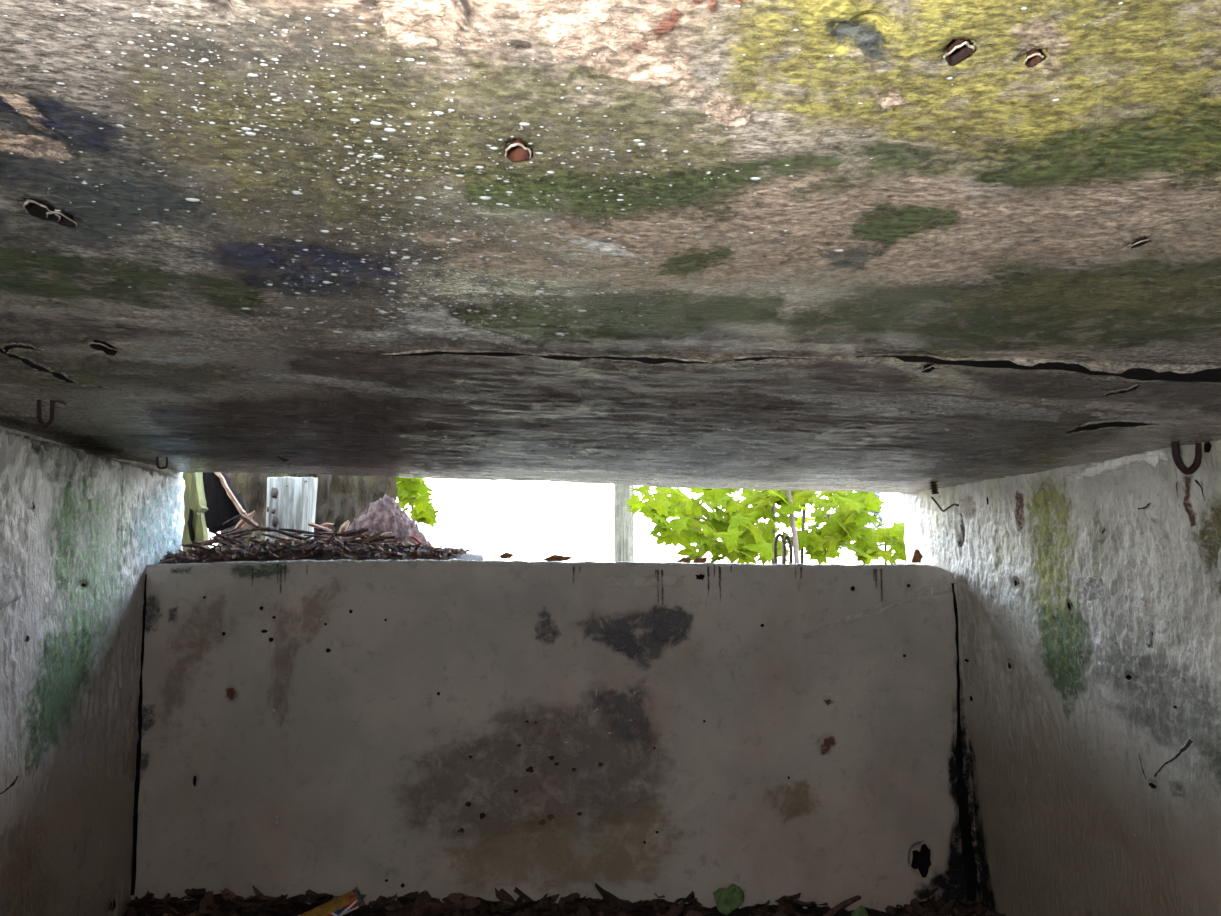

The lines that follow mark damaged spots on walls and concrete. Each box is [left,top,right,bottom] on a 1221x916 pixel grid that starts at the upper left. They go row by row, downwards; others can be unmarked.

spalling [208,0,232,18]
peeling [268,0,751,128]
spalling [0,91,75,161]
crack [0,342,79,384]
crack [381,349,823,364]
crack [856,354,1221,434]
damp [252,559,927,667]
damp [409,686,658,838]
damp [915,679,995,913]